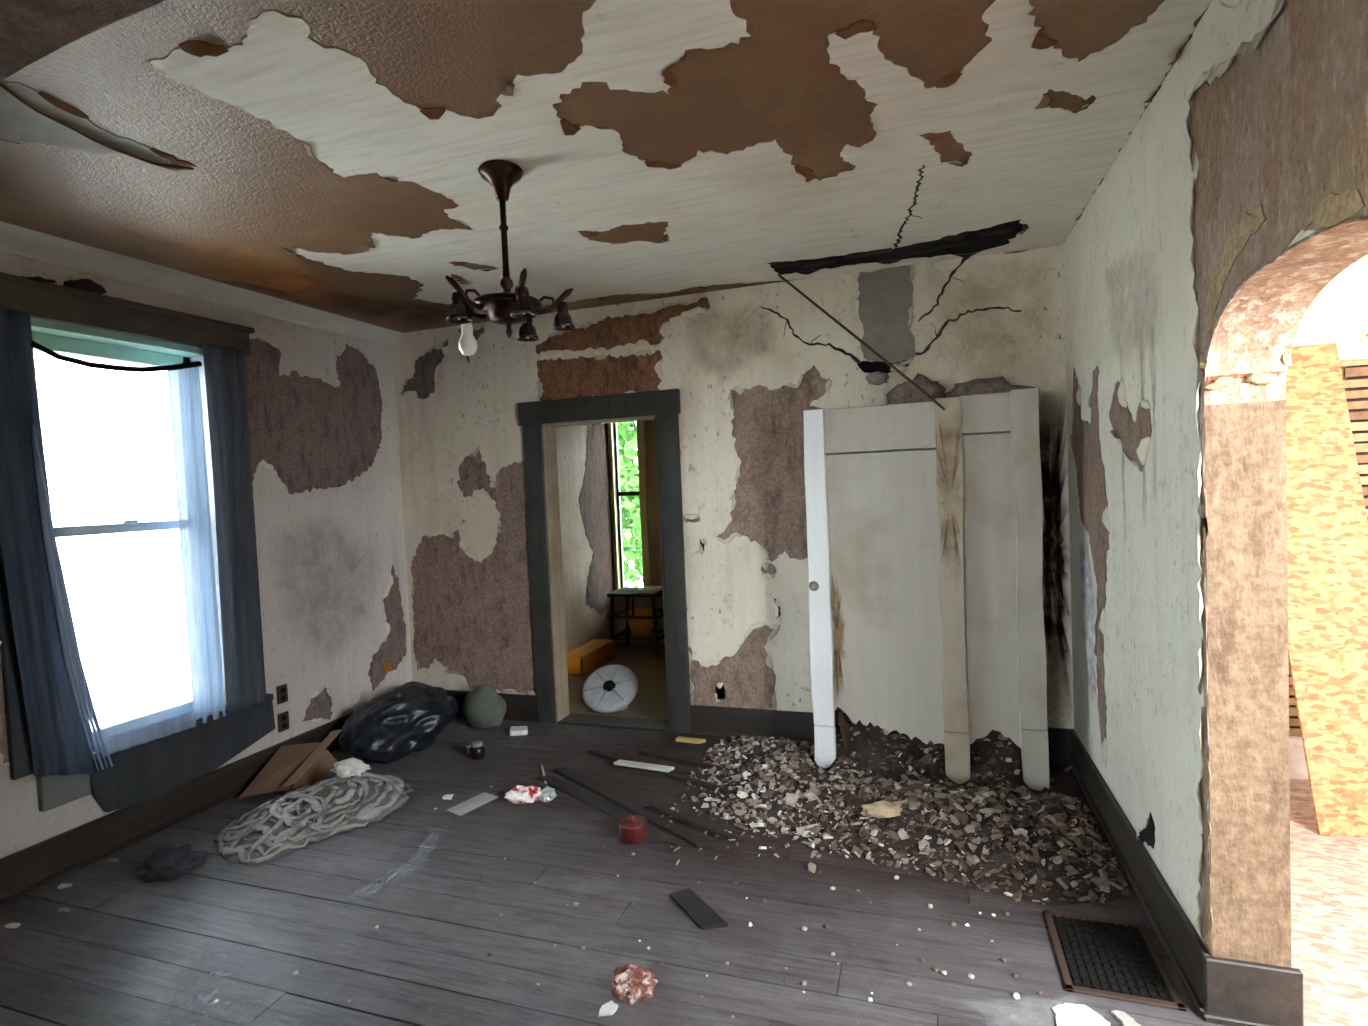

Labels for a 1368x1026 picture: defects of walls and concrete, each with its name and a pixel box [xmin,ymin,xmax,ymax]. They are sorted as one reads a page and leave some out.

peeling [149,0,1242,401]
crack [893,165,925,248]
crack [761,306,861,363]
crack [916,257,1021,355]
flaking render [245,338,383,495]
flaking render [368,445,536,695]
flaking render [683,514,700,524]
flaking render [699,366,832,578]
flaking render [1070,366,1152,770]
flaking render [0,641,30,783]
flaking render [688,598,781,710]